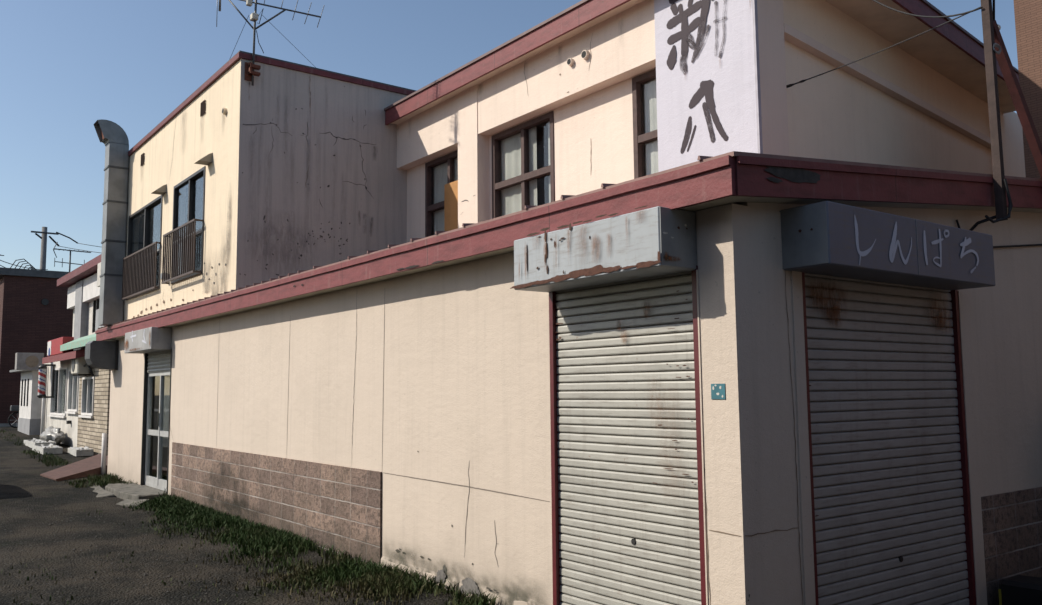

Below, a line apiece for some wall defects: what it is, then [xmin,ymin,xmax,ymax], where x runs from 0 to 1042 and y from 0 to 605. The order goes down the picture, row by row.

crack [244,111,376,196]
peeling [765,166,821,183]
peeling [526,213,618,274]